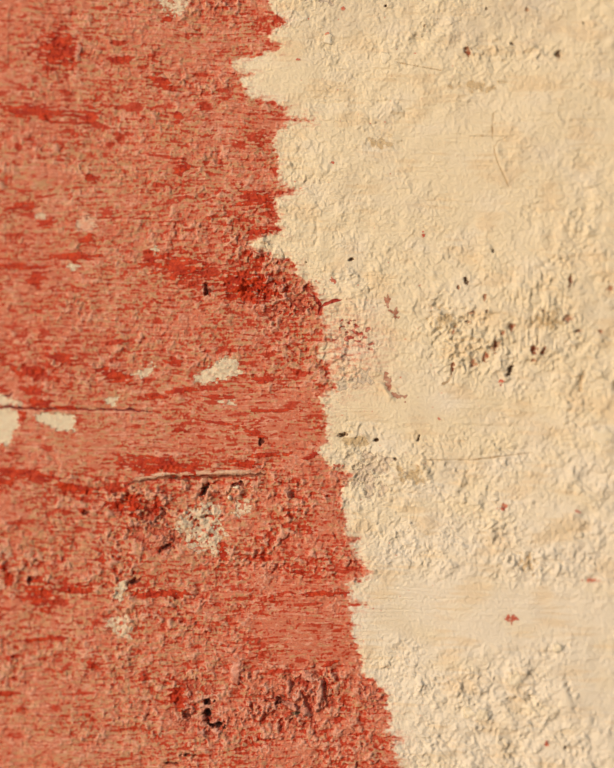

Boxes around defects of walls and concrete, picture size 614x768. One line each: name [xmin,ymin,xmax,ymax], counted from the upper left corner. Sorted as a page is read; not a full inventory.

peeling [158,0,189,17]
peeling [193,355,244,385]
crack [0,392,149,412]
peeling [0,394,23,446]
peeling [34,412,76,432]
crack [127,470,266,485]